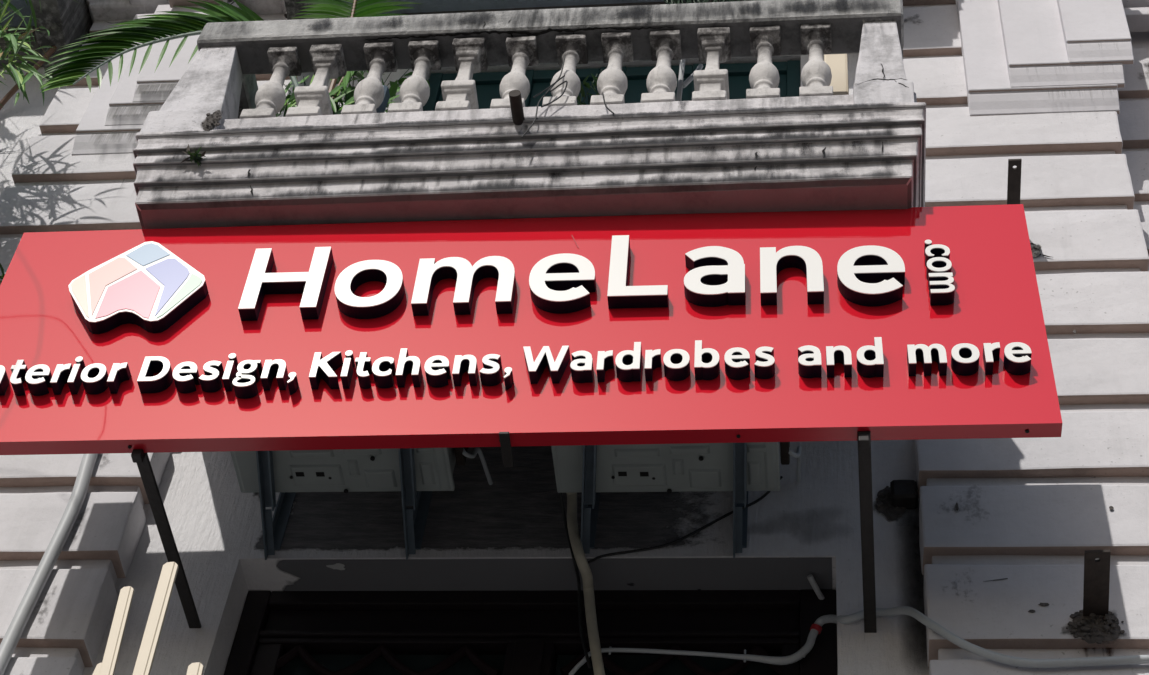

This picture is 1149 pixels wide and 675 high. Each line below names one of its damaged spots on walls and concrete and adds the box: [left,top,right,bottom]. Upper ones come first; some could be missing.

crack [857,64,907,87]
spalling [1063,610,1125,644]